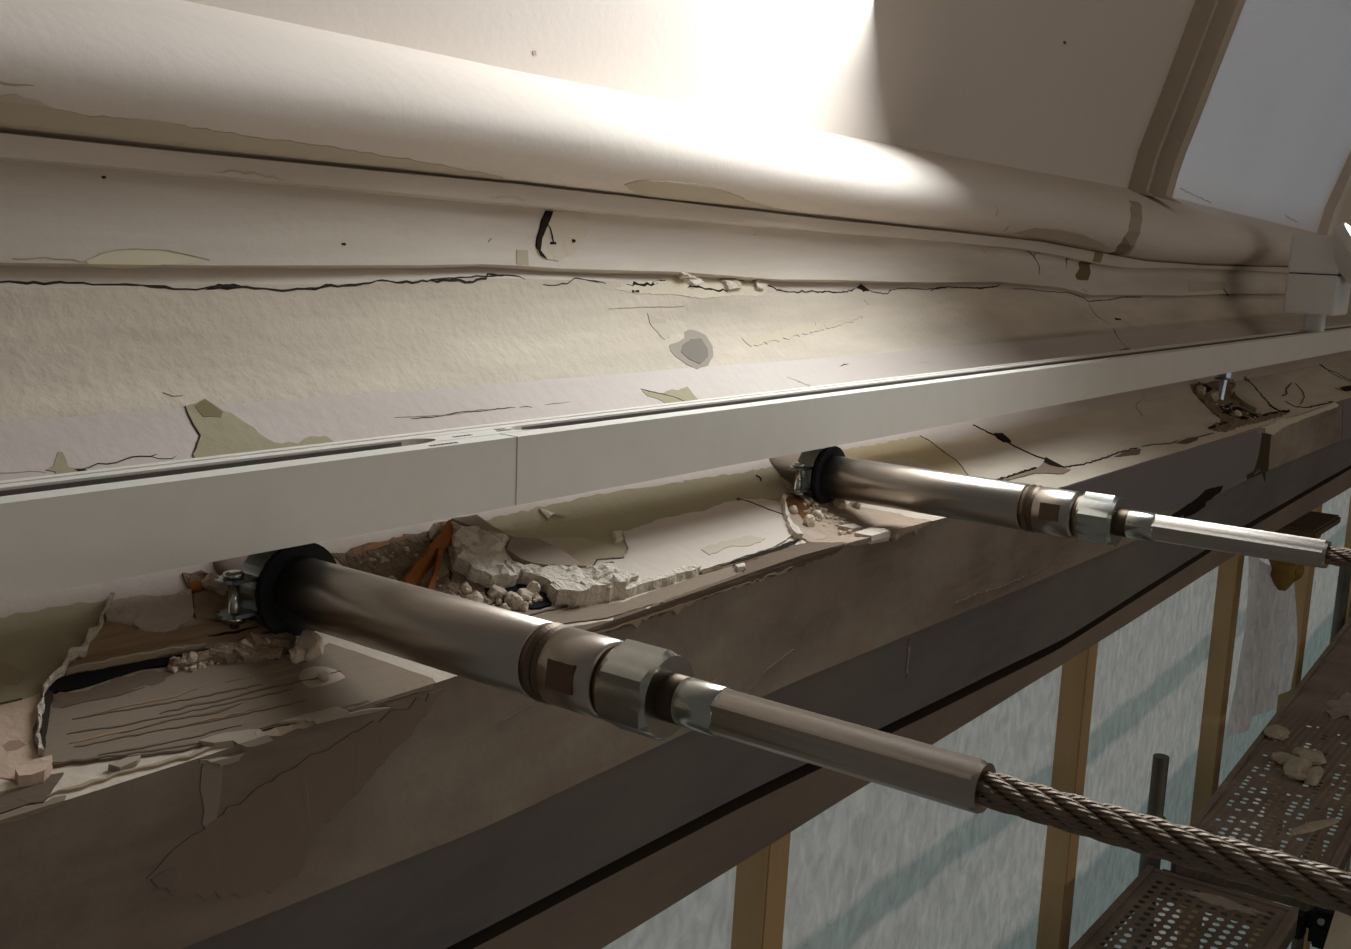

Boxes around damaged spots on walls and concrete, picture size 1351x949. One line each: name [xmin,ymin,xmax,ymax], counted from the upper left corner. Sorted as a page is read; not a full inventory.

crack [0,206,1141,350]
peeling [46,452,79,474]
peeling [186,398,334,458]
crack [920,392,1213,480]
spalling [1177,377,1339,444]
crack [1248,364,1351,416]
spalling [182,570,220,594]
peeling [331,492,931,633]
peeling [0,592,397,799]